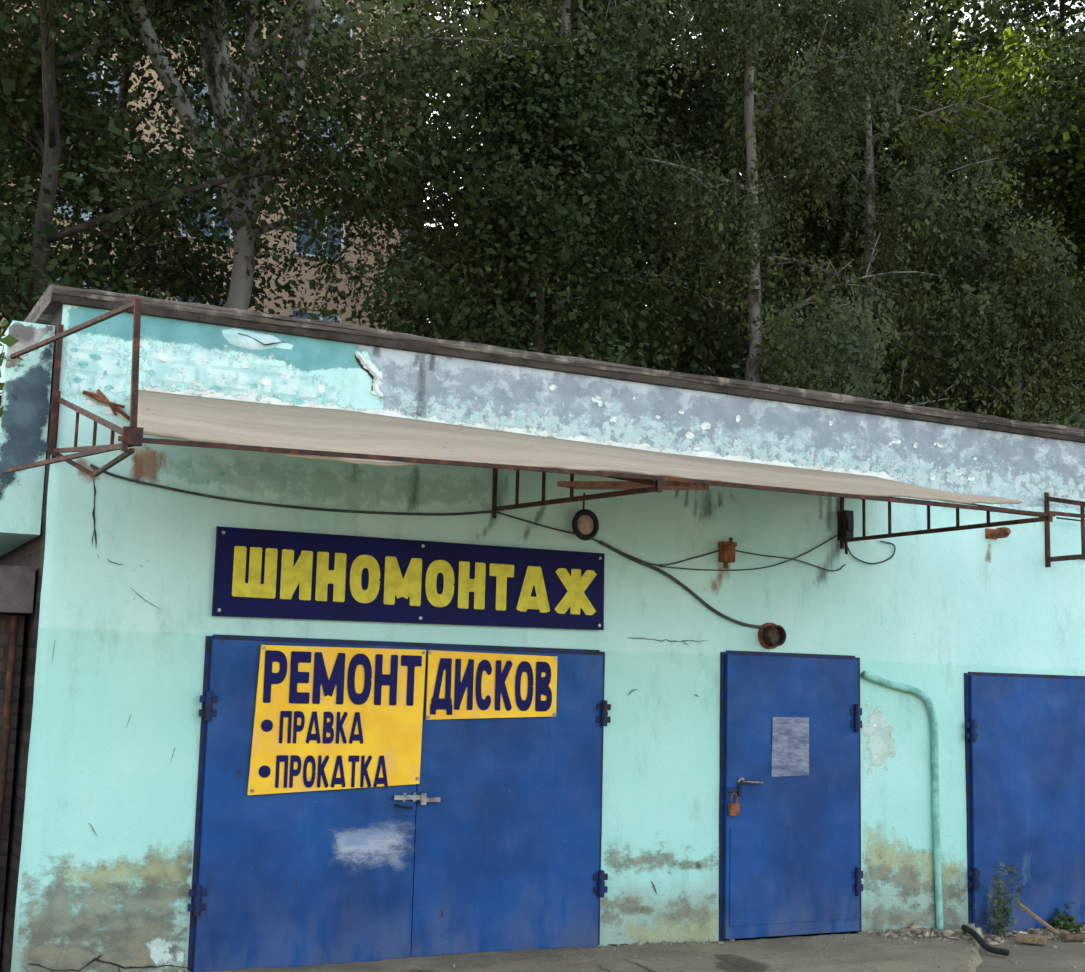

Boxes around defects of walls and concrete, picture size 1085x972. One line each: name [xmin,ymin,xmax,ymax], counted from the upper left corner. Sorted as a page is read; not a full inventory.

leakage [0,322,54,499]
peeling [63,307,1085,511]
corrosion [133,448,162,481]
crack [92,478,160,609]
peeling [862,703,897,774]
leakage [21,851,192,972]
leakage [601,895,717,943]
leakage [606,852,713,869]
leakage [863,839,965,932]
crack [28,955,188,972]
peeling [146,938,184,972]